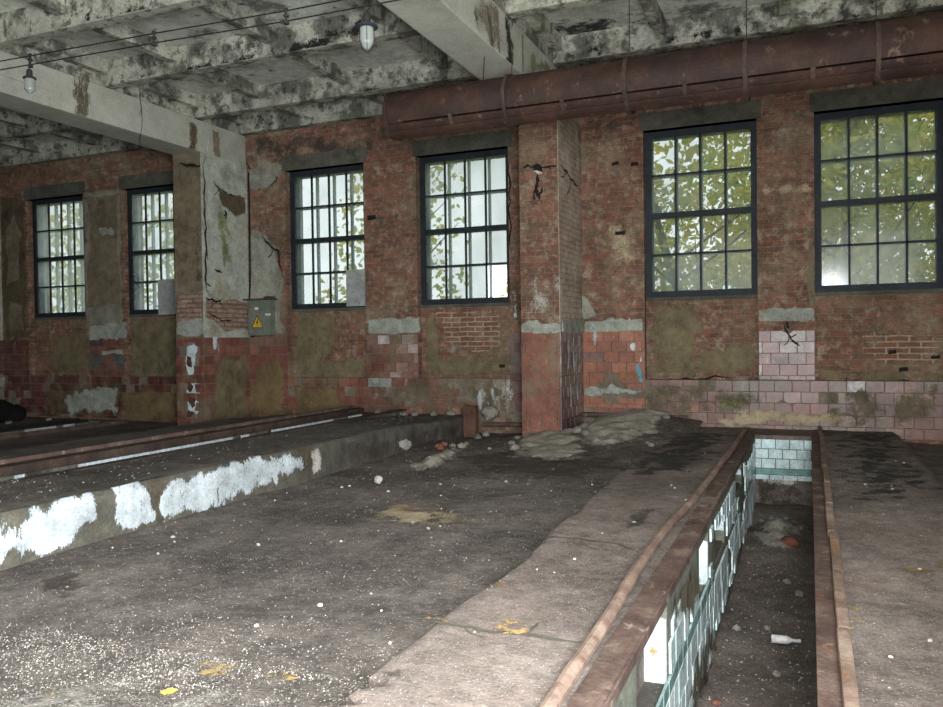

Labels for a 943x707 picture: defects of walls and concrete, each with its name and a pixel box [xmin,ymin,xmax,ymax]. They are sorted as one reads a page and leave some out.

mould [174,18,362,72]
spalling [207,129,221,157]
flaking render [215,173,275,217]
crack [507,162,579,252]
flaking render [0,197,27,338]
peeling [176,236,280,417]
peeling [368,319,419,335]
crack [784,325,801,347]
spalling [861,325,942,372]
spalling [0,383,119,435]